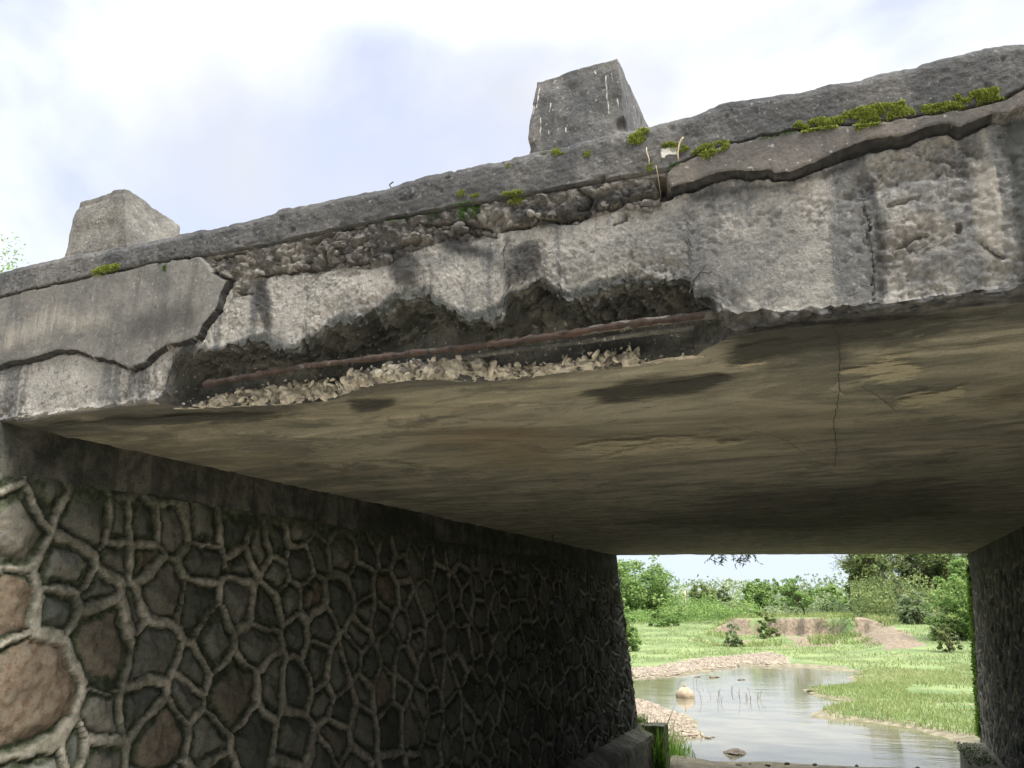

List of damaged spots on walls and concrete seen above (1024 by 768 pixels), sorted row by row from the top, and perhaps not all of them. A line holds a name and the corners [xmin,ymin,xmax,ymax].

crack [671,92,1017,200]
spalling [0,90,1024,409]
crack [0,256,236,373]
damp [578,309,1002,404]
crack [833,325,914,465]